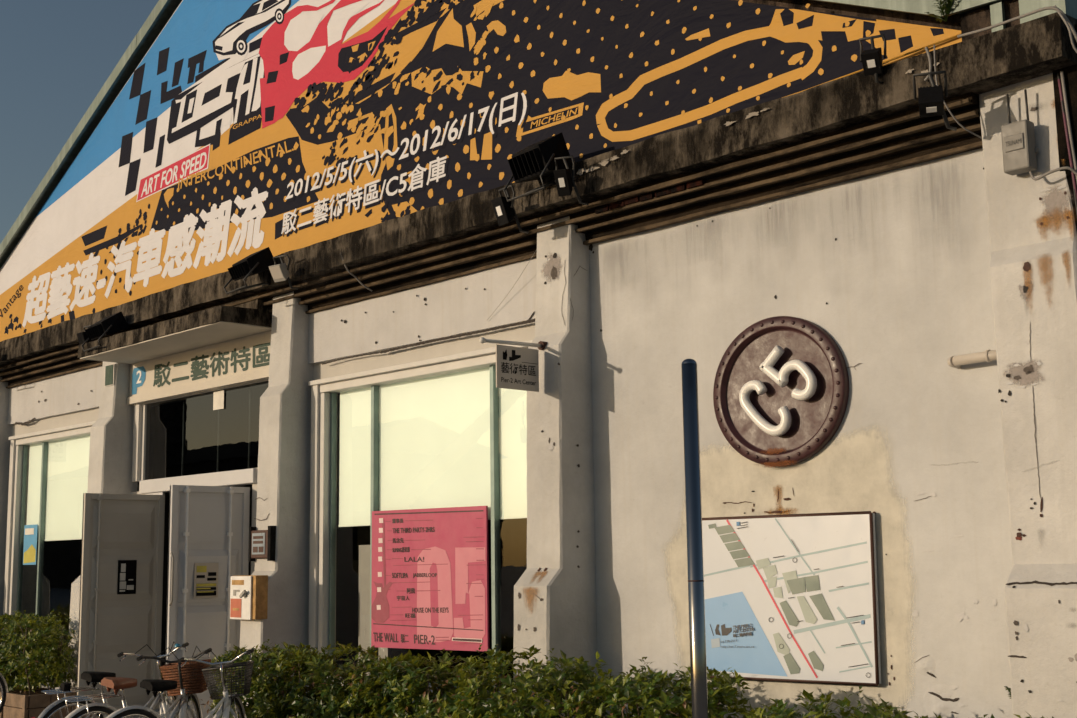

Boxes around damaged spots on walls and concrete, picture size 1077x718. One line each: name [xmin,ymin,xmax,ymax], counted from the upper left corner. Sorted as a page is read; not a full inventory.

peeling [577,150,629,175]
spalling [542,253,561,284]
corrosion [1023,257,1051,295]
spalling [998,360,1043,403]
corrosion [761,448,794,467]
corrosion [723,487,794,515]
corrosion [525,567,547,603]
peeling [667,504,691,686]
peeling [700,429,912,718]